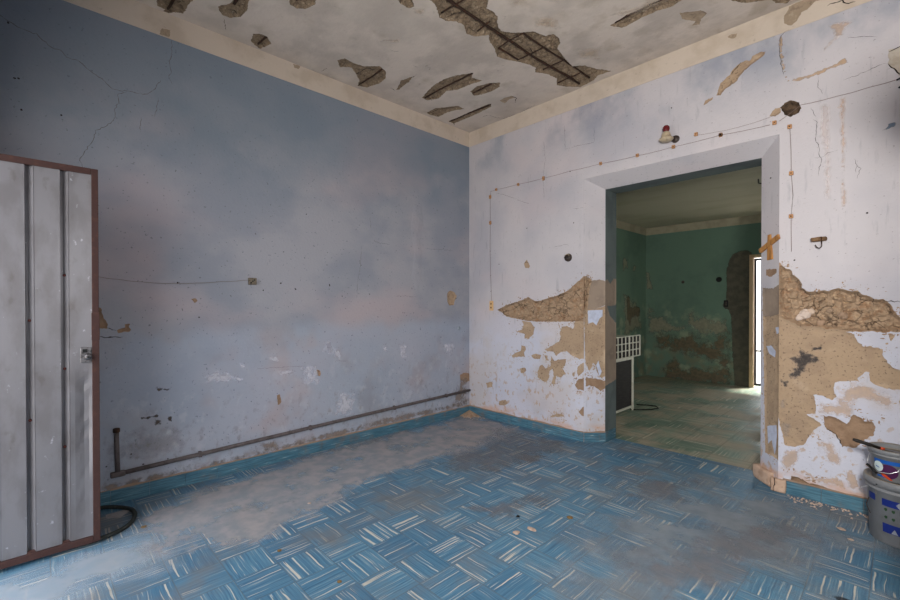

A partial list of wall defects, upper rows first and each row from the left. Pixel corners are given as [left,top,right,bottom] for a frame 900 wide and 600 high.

spalling [157,0,193,14]
spalling [218,0,249,18]
spalling [610,0,707,28]
spalling [732,0,819,25]
spalling [430,0,610,87]
spalling [337,58,386,87]
spalling [704,51,766,105]
spalling [495,272,616,396]
peeling [761,261,900,489]